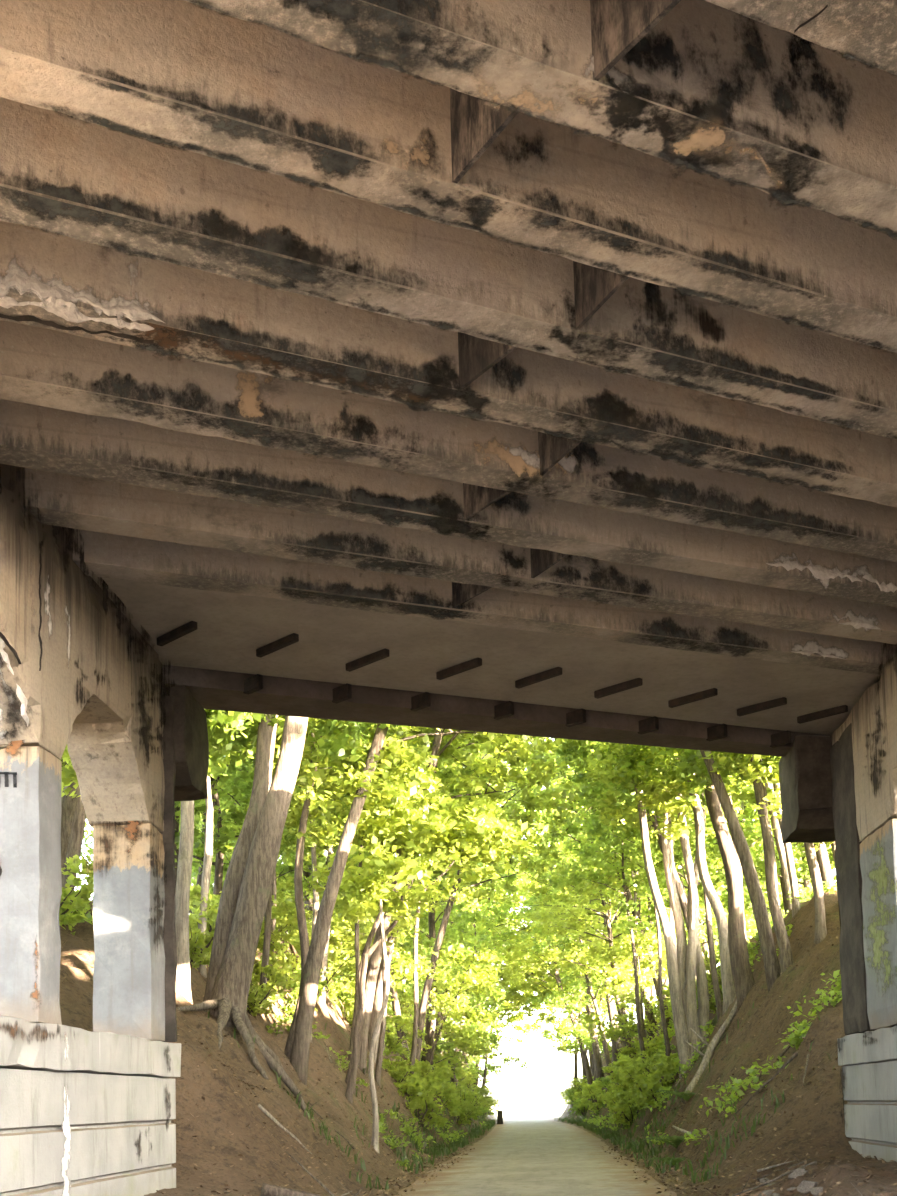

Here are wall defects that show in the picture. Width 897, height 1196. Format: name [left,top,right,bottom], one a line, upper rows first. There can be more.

water stain [187,0,230,16]
water stain [44,67,383,200]
water stain [248,0,897,212]
spalling [0,258,165,344]
water stain [0,172,897,412]
water stain [63,315,857,540]
crack [0,541,42,671]
water stain [276,532,489,620]
water stain [501,549,653,604]
water stain [641,617,769,657]
spalling [791,641,848,659]
spalling [766,553,897,593]